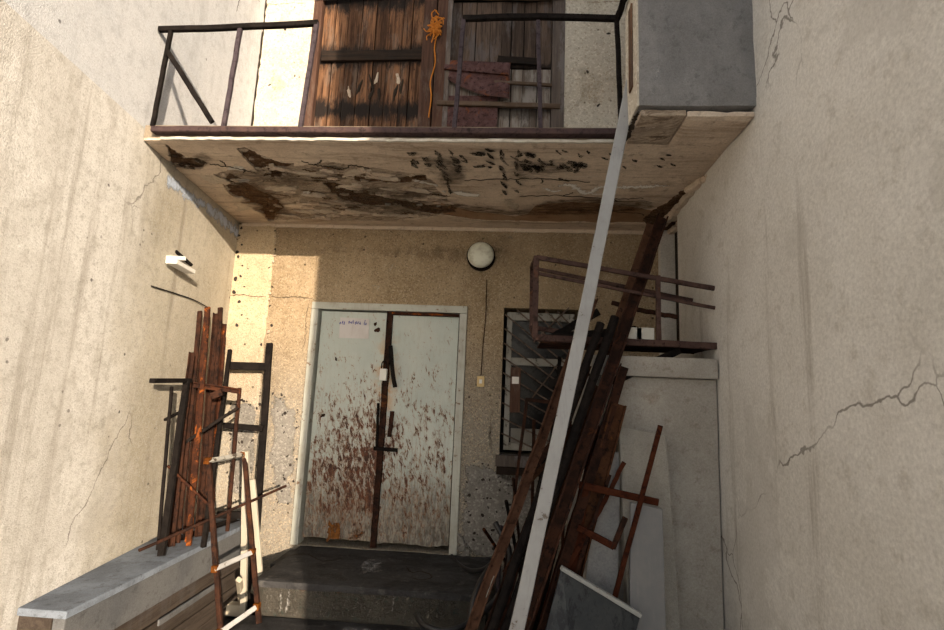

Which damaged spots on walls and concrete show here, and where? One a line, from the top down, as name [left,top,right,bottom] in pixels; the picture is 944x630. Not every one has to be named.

damp [235,175,322,218]
peeling [167,145,457,359]
damp [333,148,604,223]
damp [610,201,652,223]
flaking render [226,390,299,511]
flaking render [461,461,538,558]